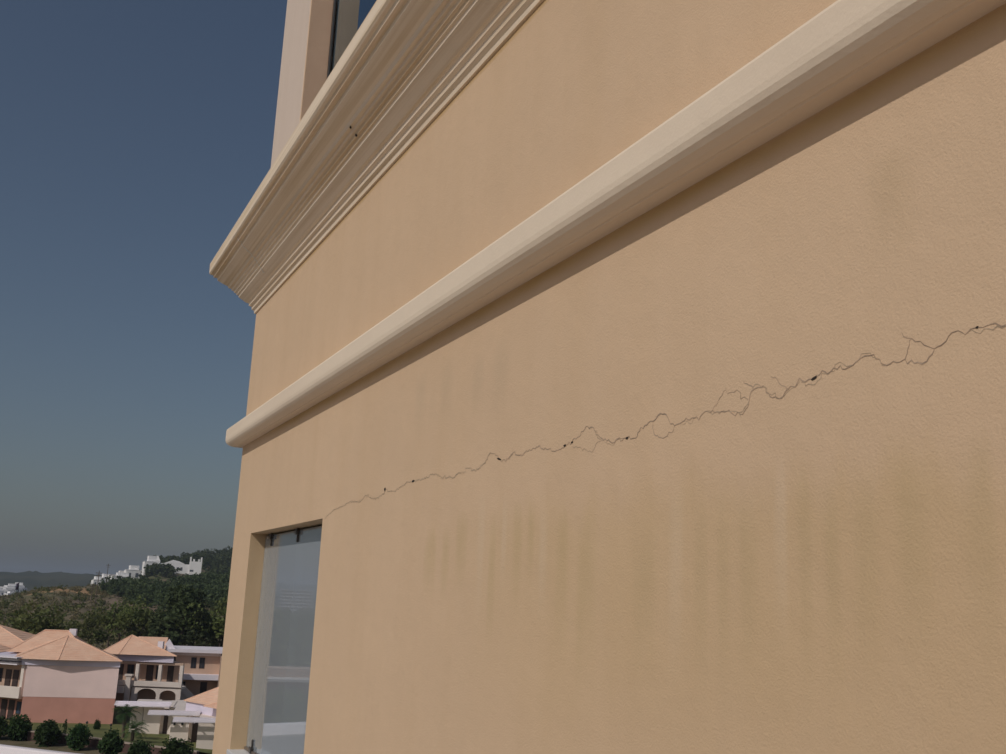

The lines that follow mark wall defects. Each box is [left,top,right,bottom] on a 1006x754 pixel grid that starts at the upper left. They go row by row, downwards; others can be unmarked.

crack [326,322,1006,517]
damp [391,361,1006,754]